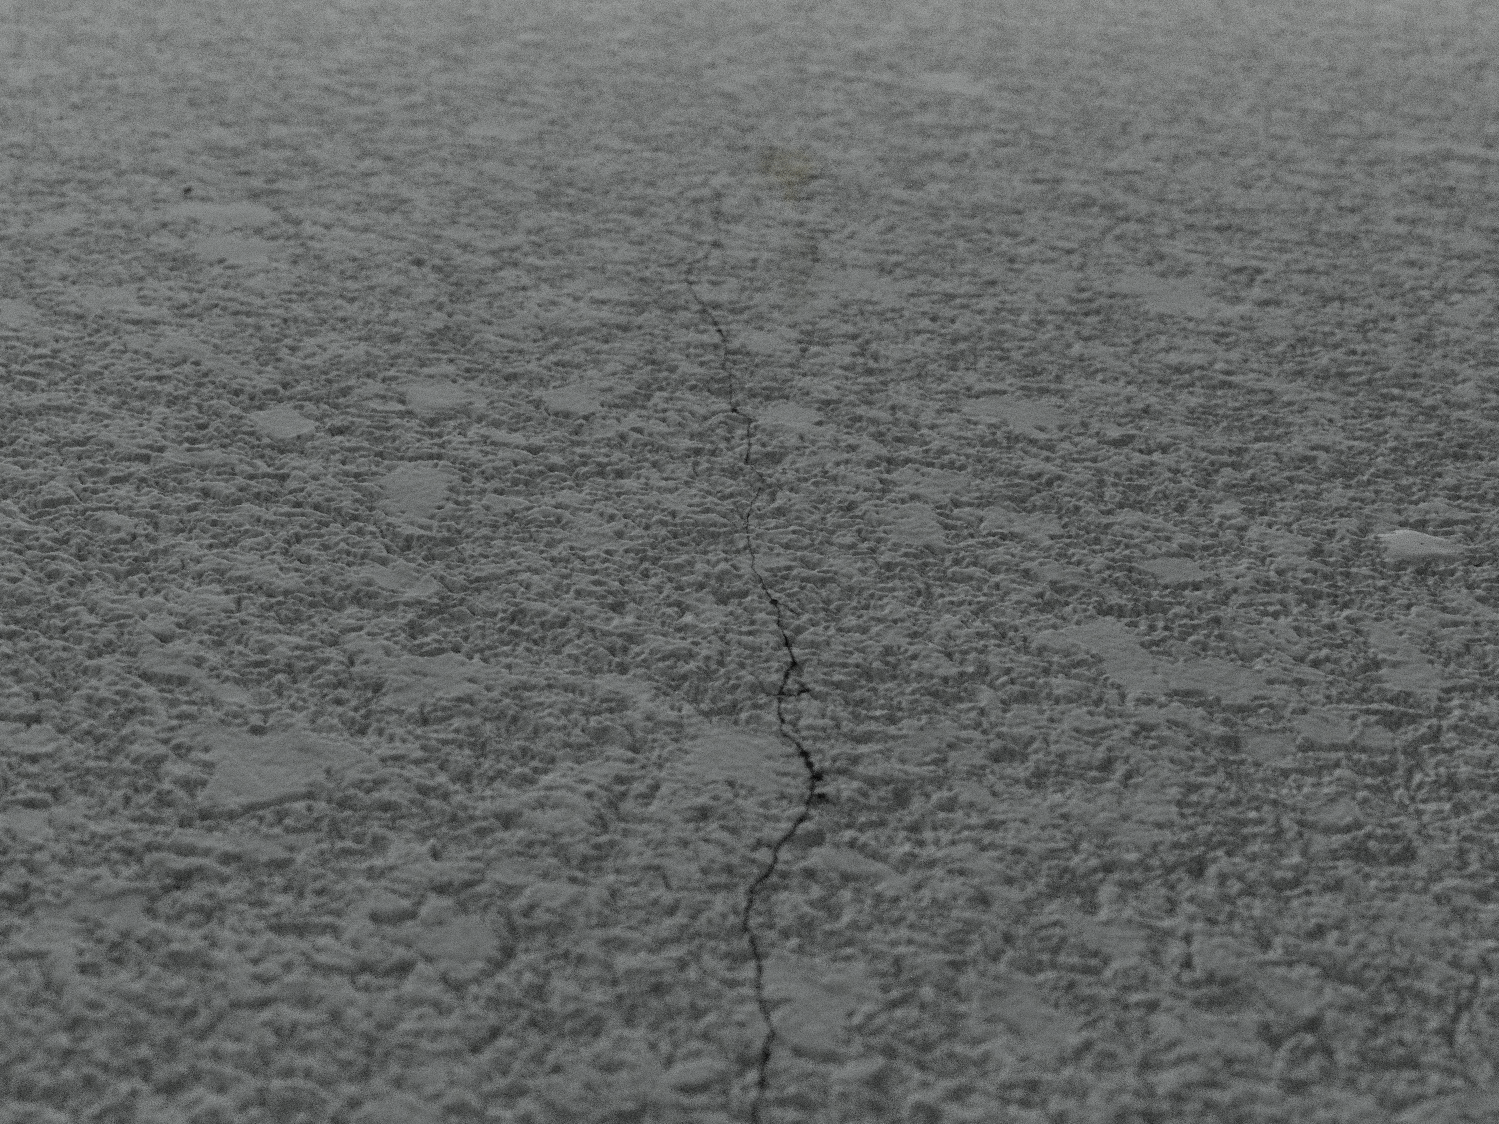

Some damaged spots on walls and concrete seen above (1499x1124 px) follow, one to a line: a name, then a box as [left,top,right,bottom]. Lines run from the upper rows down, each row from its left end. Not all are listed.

crack [686,190,834,1124]